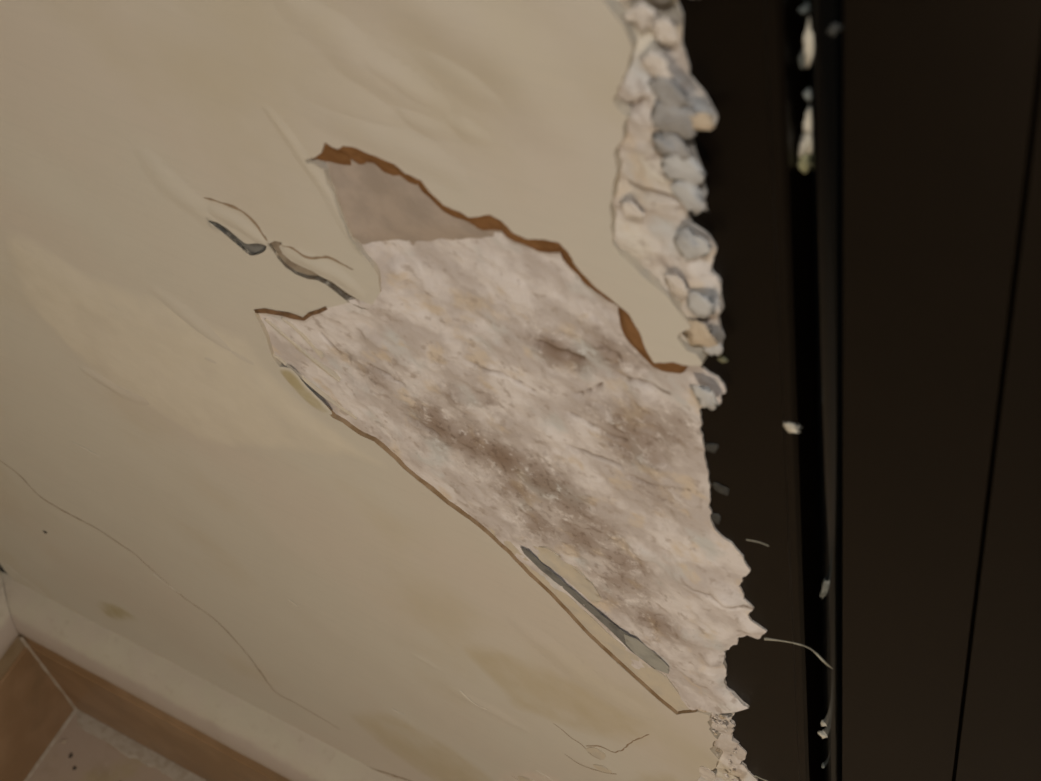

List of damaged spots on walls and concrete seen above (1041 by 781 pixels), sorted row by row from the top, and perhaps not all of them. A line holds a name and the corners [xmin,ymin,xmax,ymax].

flaking render [259,0,767,781]
crack [1,461,339,729]
crack [556,725,649,774]